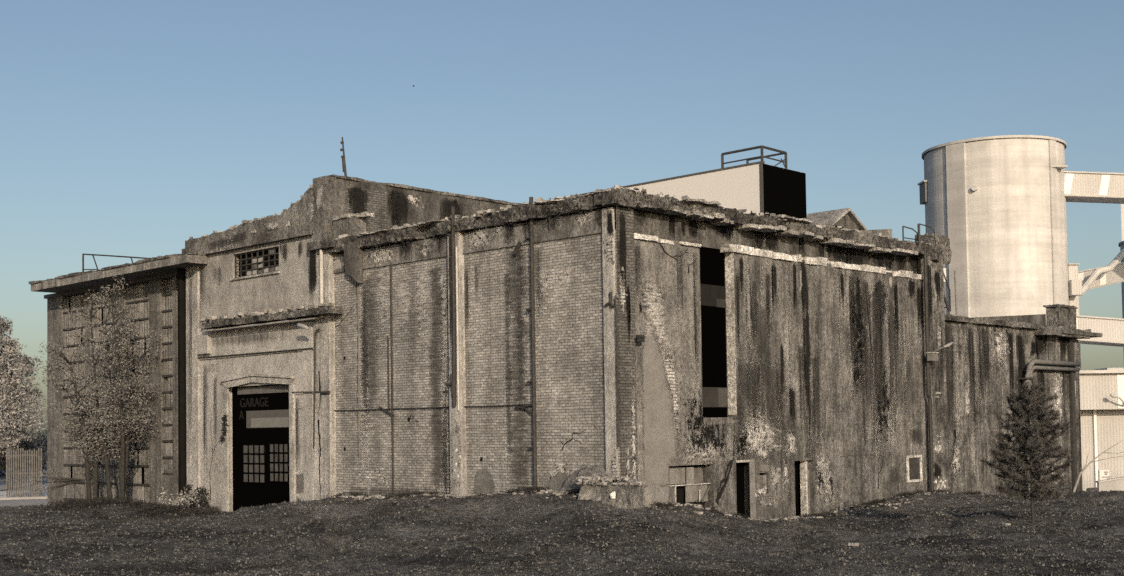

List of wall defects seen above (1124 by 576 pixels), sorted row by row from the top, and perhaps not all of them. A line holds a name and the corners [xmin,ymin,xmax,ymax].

water stain [349,186,367,214]
water stain [387,191,408,226]
water stain [439,198,462,220]
water stain [361,232,476,494]
water stain [505,249,572,487]
peeling [641,274,797,500]
water stain [736,240,820,433]
water stain [819,242,987,437]
water stain [1008,333,1067,394]